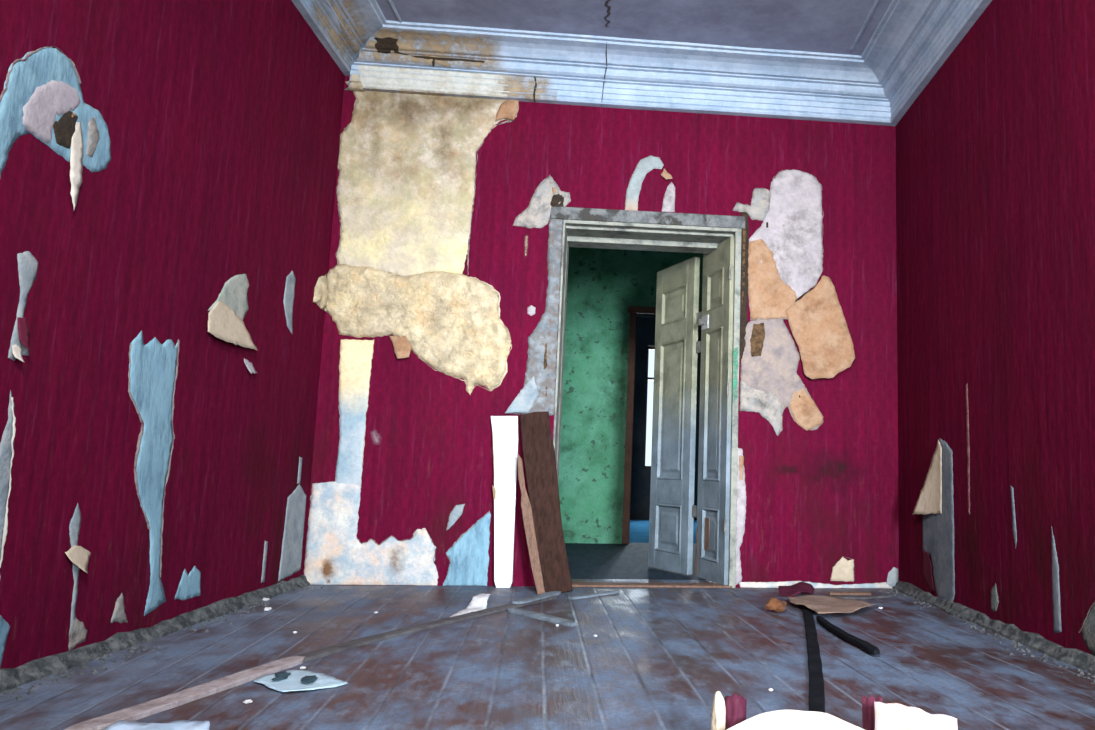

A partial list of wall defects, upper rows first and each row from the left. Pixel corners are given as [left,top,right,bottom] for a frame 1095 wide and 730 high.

peeling [346,37,511,98]
crack [601,0,611,106]
peeling [12,344,25,363]
flaking render [505,175,571,415]
flaking render [733,188,823,436]
peeling [65,545,91,573]
flaking render [304,482,439,586]